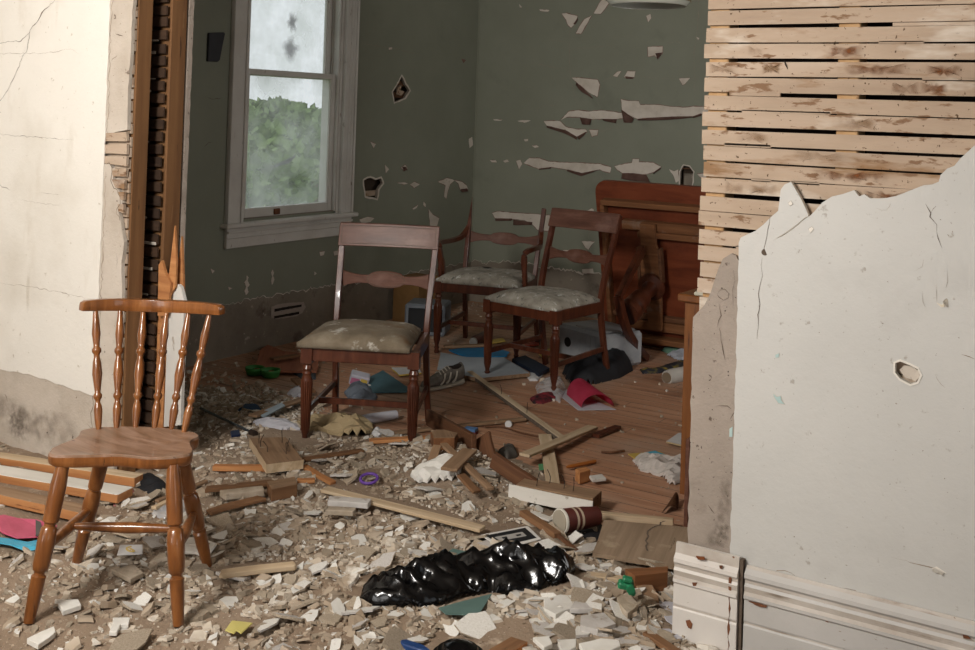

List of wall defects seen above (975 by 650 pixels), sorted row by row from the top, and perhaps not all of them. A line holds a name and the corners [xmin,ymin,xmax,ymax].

peeling [562,0,609,34]
crack [3,0,65,97]
peeling [647,46,663,59]
flaking render [392,75,411,104]
peeling [572,77,600,98]
peeling [544,99,708,140]
flaking render [99,0,137,299]
peeling [490,139,706,185]
flaking render [363,165,389,200]
peeling [438,178,468,199]
flaking render [0,311,125,457]
flaking render [893,359,922,386]